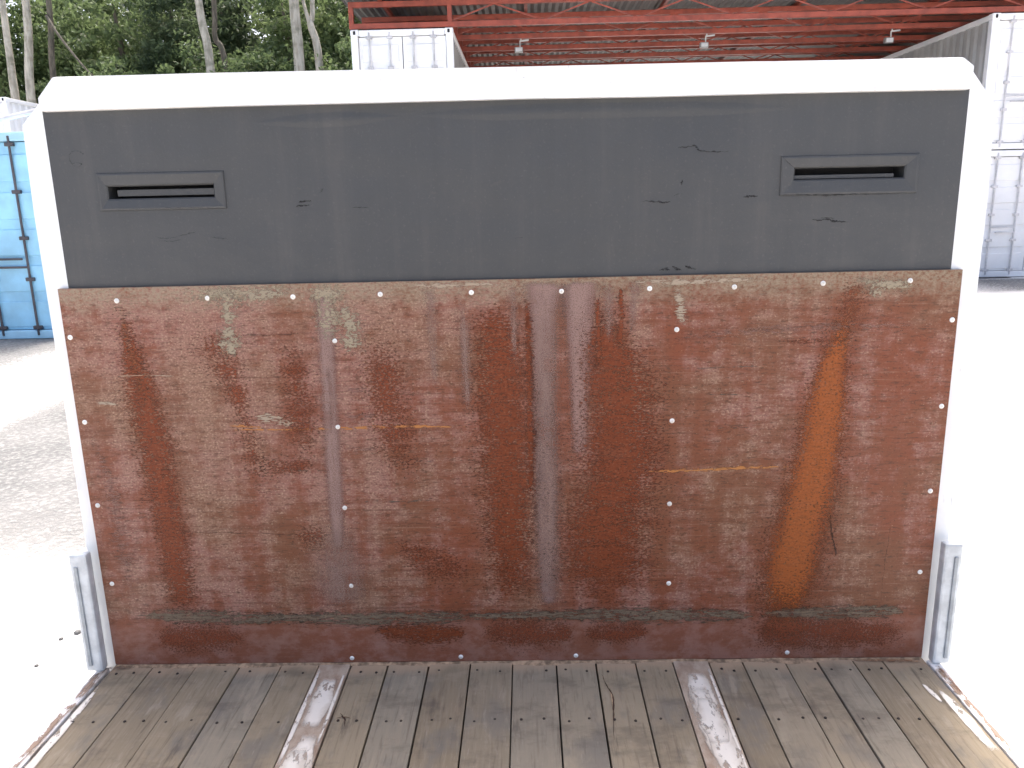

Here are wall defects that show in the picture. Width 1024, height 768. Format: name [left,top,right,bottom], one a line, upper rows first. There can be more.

rust [110,300,244,656]
leakage [506,279,641,610]
rust [395,283,912,662]